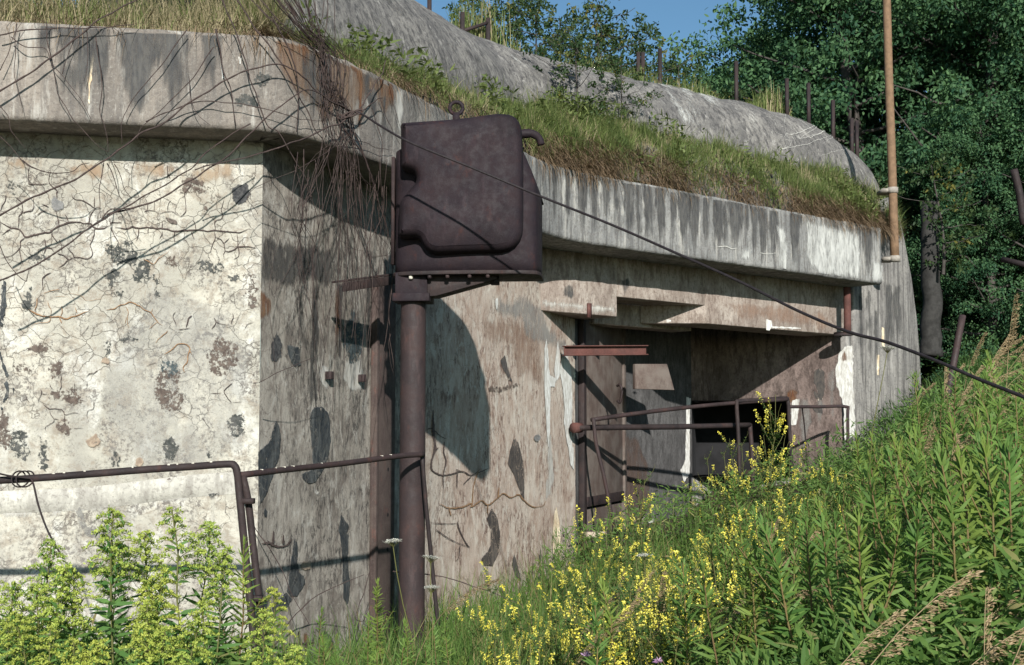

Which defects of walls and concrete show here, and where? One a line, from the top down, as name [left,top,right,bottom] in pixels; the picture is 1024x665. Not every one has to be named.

water stain [40,26,188,111]
water stain [203,35,223,78]
rust [278,40,394,127]
crack [0,165,257,430]
water stain [552,168,901,440]